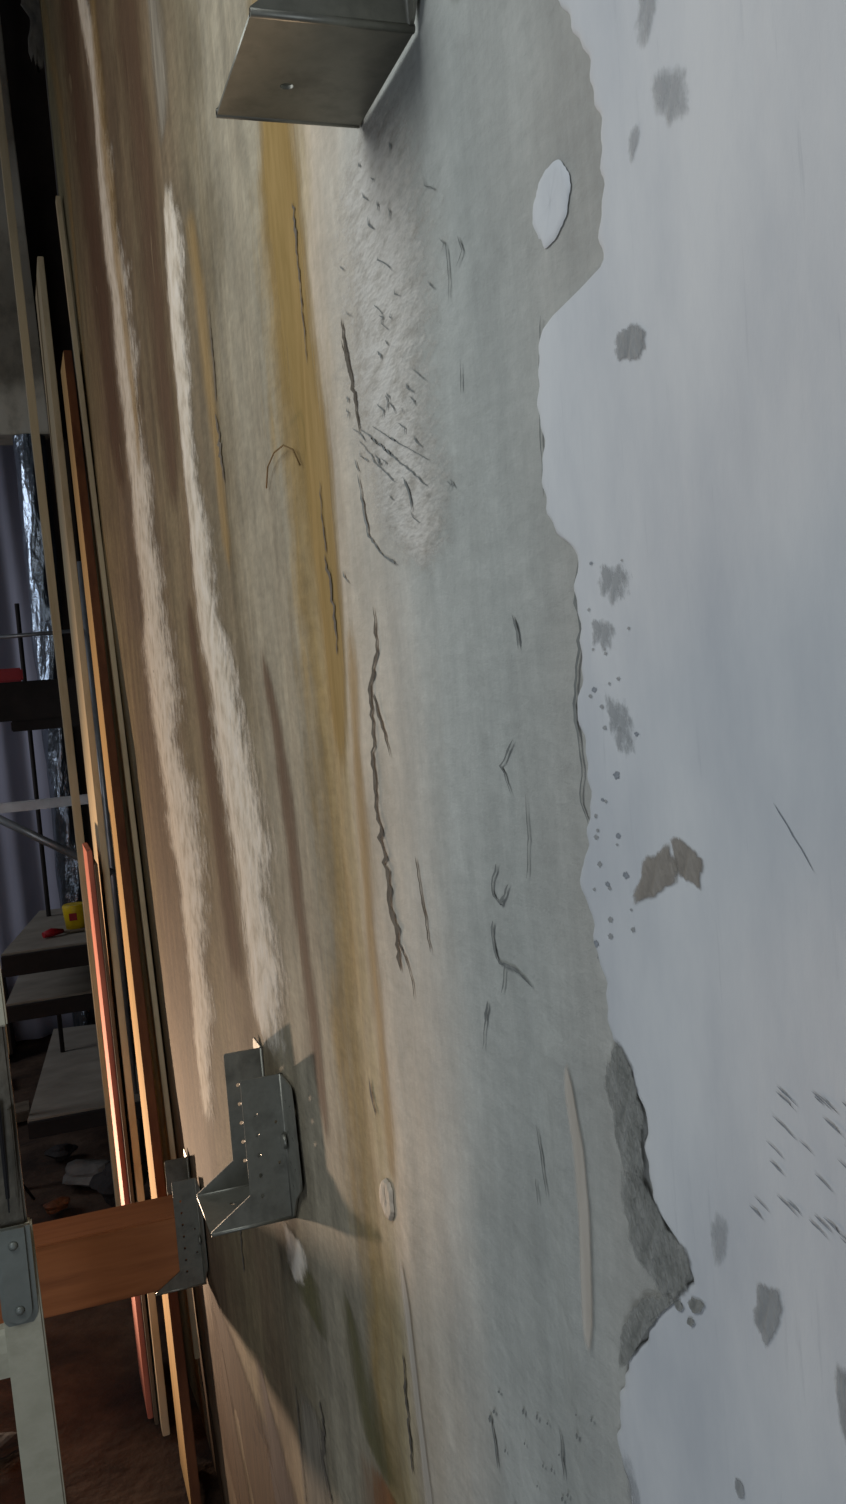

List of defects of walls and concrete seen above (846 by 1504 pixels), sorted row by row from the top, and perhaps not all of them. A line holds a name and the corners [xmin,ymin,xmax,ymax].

peeling [532,159,571,249]
peeling [616,325,645,361]
peeling [593,838,702,932]
peeling [379,1178,395,1221]
flaking render [604,1043,704,1367]
peeling [837,1369,846,1438]